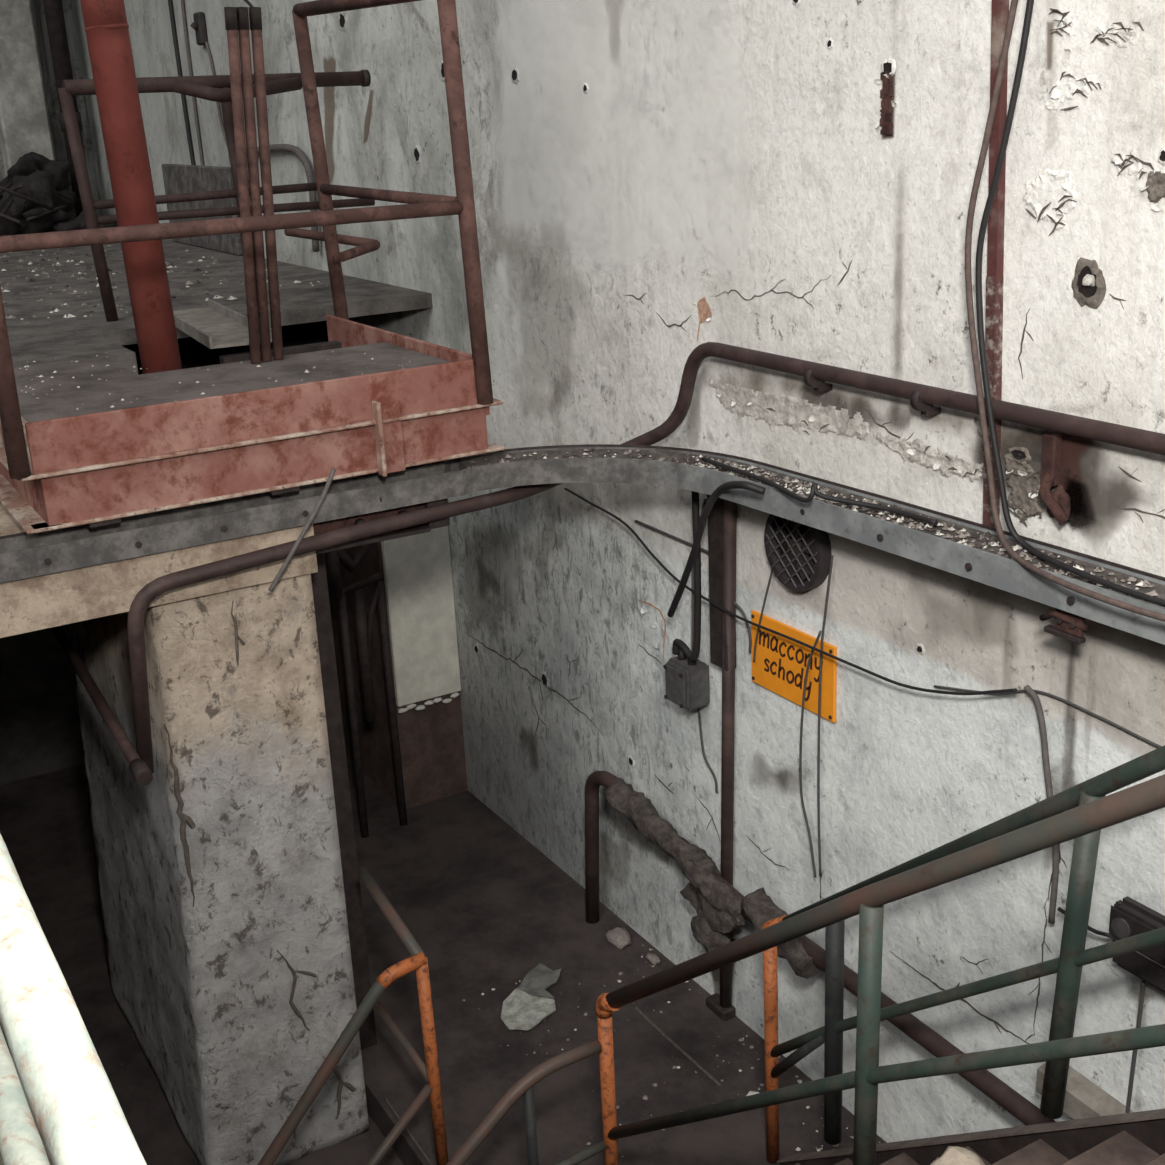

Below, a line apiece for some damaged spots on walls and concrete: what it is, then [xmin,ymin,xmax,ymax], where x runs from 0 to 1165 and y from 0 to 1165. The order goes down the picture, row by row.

spalling [1048,8,1077,54]
spalling [1091,22,1144,48]
spalling [1045,71,1101,113]
spalling [1023,169,1079,236]
spalling [1110,146,1165,211]
crack [628,293,689,332]
crack [717,261,852,309]
spalling [709,379,984,482]
spalling [1004,447,1043,526]
crack [164,725,196,907]